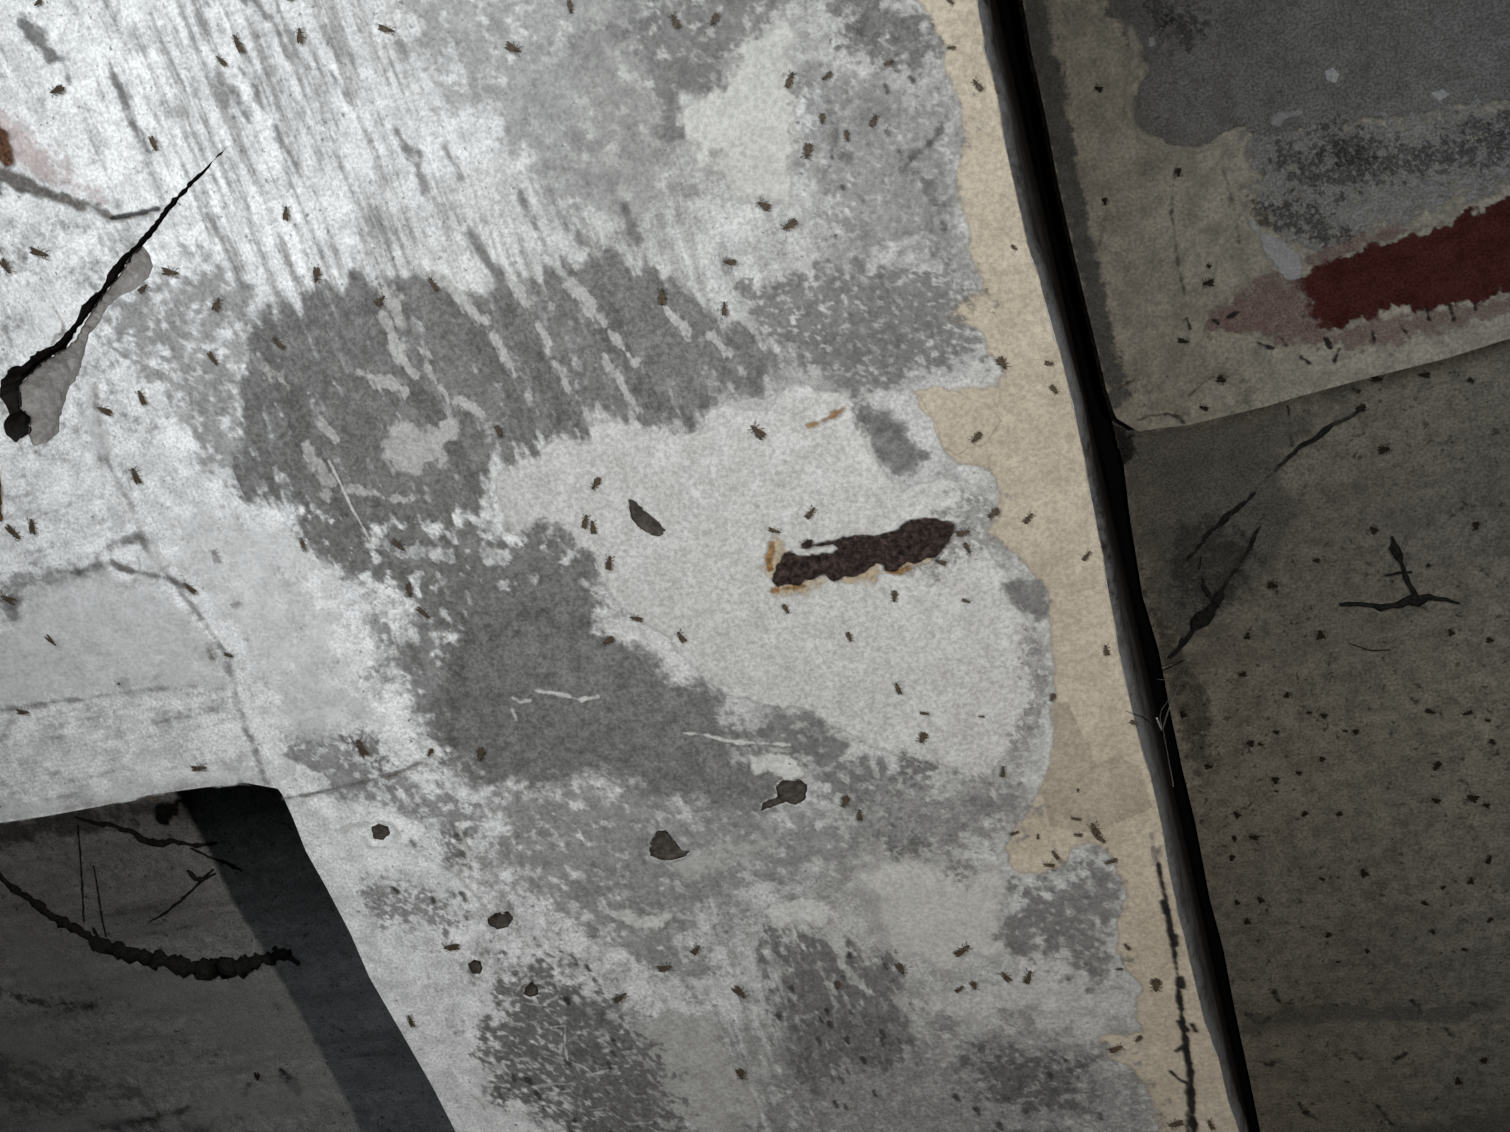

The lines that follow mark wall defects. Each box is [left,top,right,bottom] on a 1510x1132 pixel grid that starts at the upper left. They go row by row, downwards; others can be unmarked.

crack [0,149,225,446]
peeling [301,405,431,503]
peeling [356,284,485,475]
peeling [416,264,532,402]
damp [102,0,1042,981]
corrosion [764,518,954,596]
peeling [496,0,1238,1132]
spalling [487,911,513,929]
damp [469,945,696,1132]
damp [742,898,1175,1132]
damp [994,847,1130,993]
crack [1151,833,1199,1132]